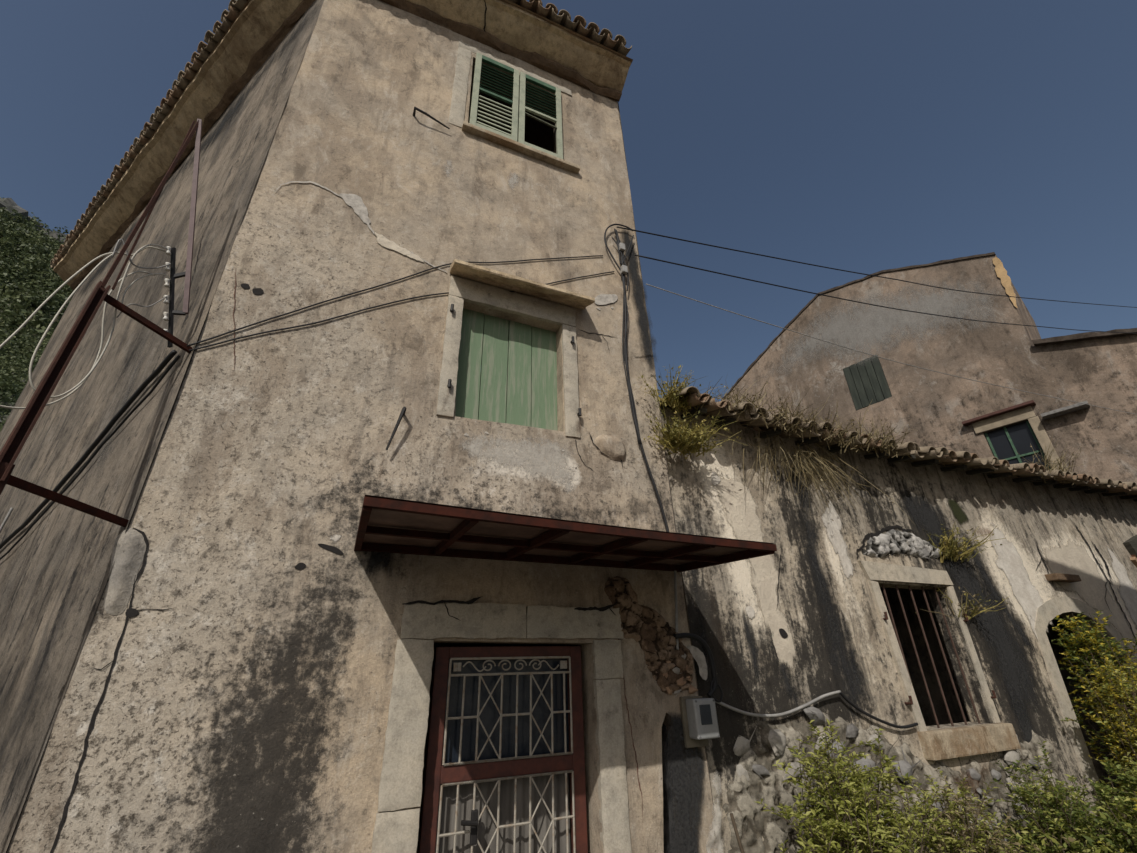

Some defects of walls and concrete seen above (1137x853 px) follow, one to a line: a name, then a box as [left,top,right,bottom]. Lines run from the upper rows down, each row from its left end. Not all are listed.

crack [50,575,177,853]
crack [403,597,481,621]
spalling [604,576,708,700]
leakage [743,613,759,680]
leakage [770,630,797,702]
leakage [793,468,871,709]
spalling [822,500,942,579]
leakage [901,492,1038,743]
peeling [1045,539,1137,641]